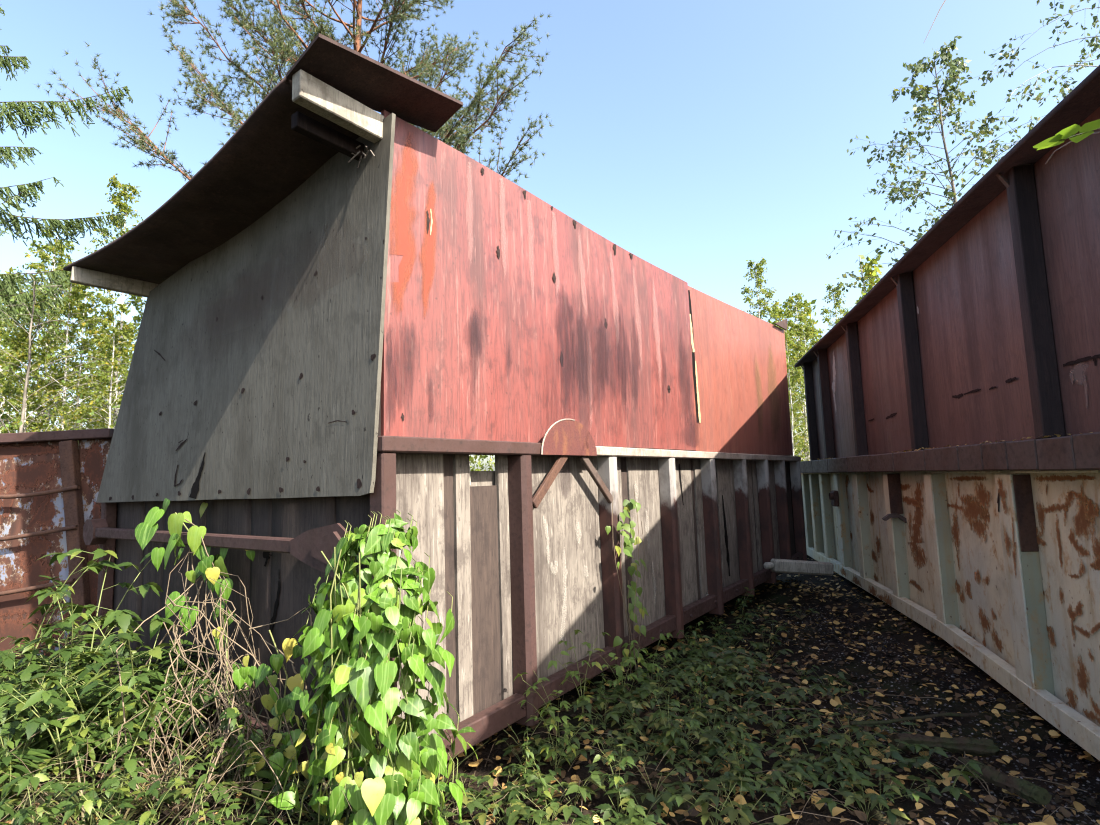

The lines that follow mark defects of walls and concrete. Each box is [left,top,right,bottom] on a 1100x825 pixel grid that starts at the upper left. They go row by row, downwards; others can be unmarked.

rust [391,136,436,308]
rust [840,537,892,607]
rust [901,483,927,568]
rust [946,476,1016,602]
rust [1034,475,1100,578]
rust [960,609,1003,653]
rust [1059,590,1100,724]